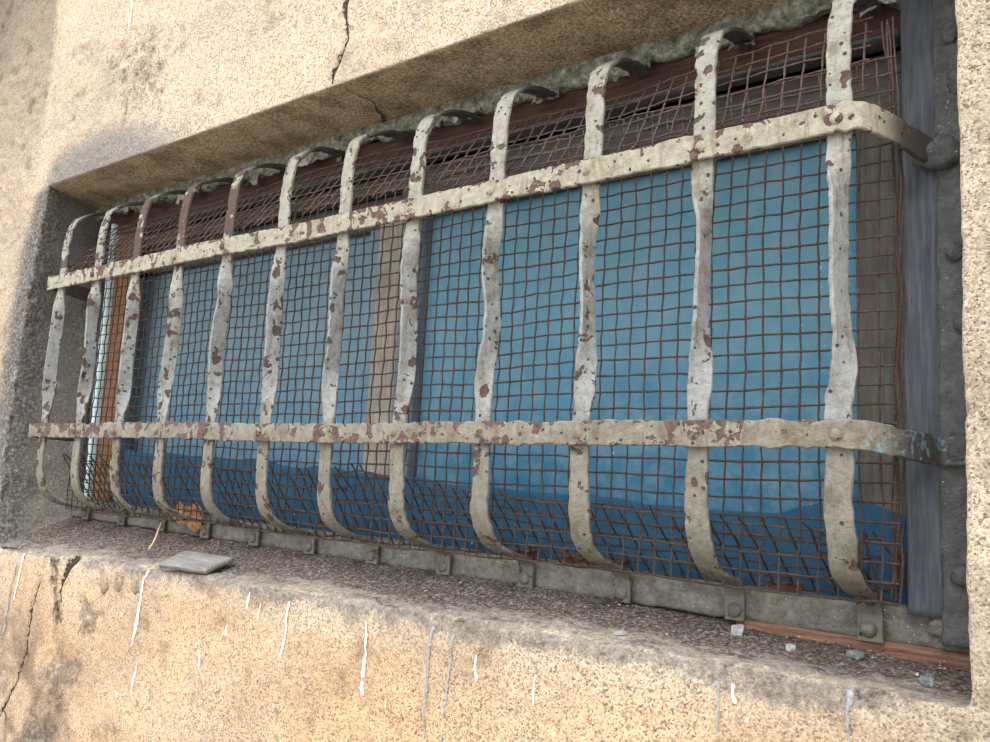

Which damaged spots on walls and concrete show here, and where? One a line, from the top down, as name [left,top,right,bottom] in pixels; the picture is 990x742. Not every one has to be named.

crack [332,0,386,123]
water stain [3,553,25,632]
crack [0,555,81,725]
water stain [131,570,150,646]
water stain [422,625,436,740]
water stain [442,633,455,719]
water stain [715,682,736,732]
water stain [845,689,854,742]